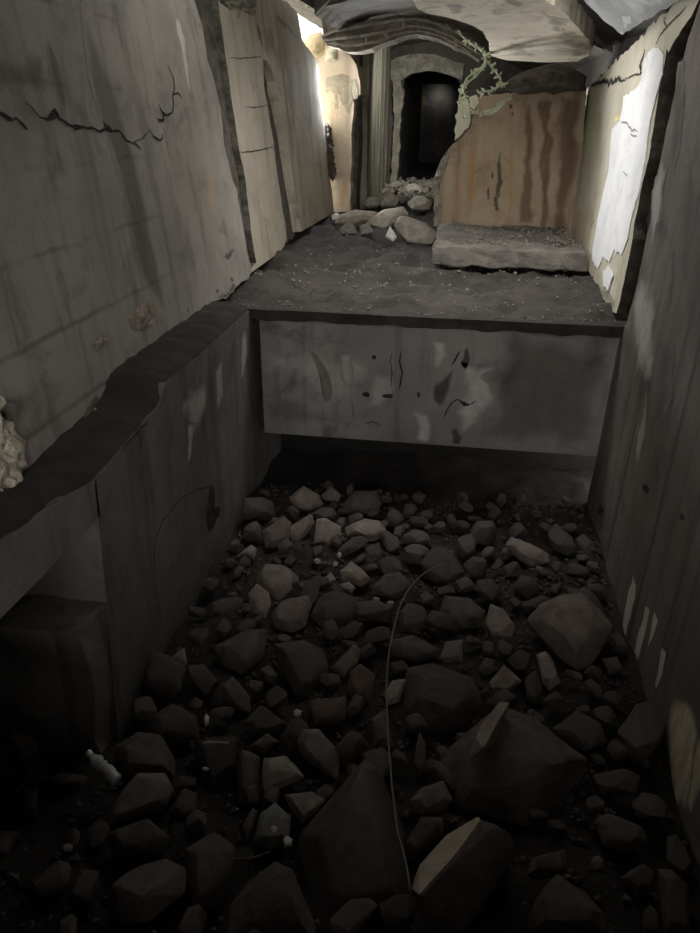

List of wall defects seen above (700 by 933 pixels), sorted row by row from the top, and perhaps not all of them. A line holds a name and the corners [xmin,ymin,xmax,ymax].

crack [588,8,685,88]
crack [0,66,182,150]
flaking render [325,74,358,112]
corrosion [518,93,594,252]
peeling [592,47,664,291]
crack [351,351,420,426]
crack [444,399,476,418]
spalling [0,301,700,933]